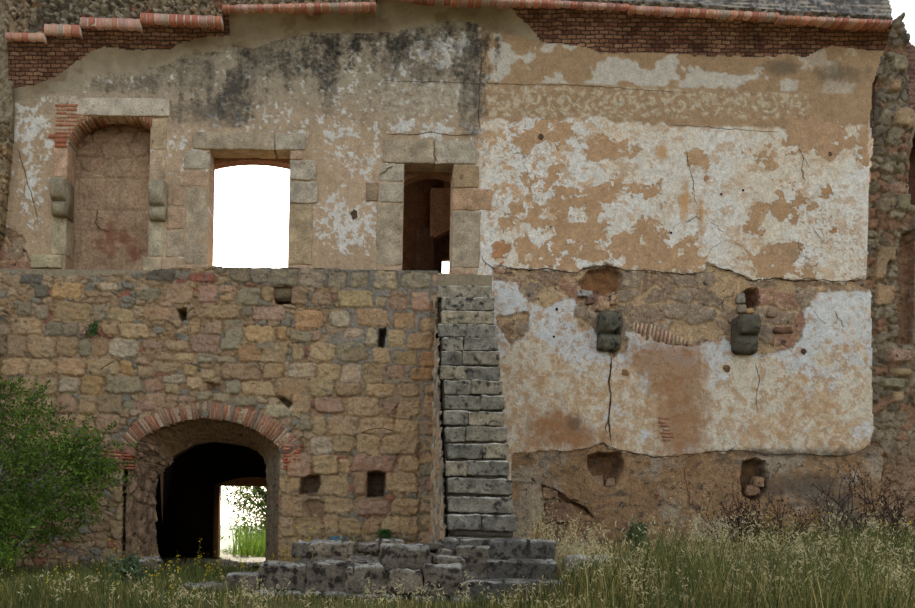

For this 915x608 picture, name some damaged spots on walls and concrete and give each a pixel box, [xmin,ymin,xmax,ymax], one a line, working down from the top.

damp [178,50,269,127]
spalling [490,113,870,358]
crack [536,357,868,506]